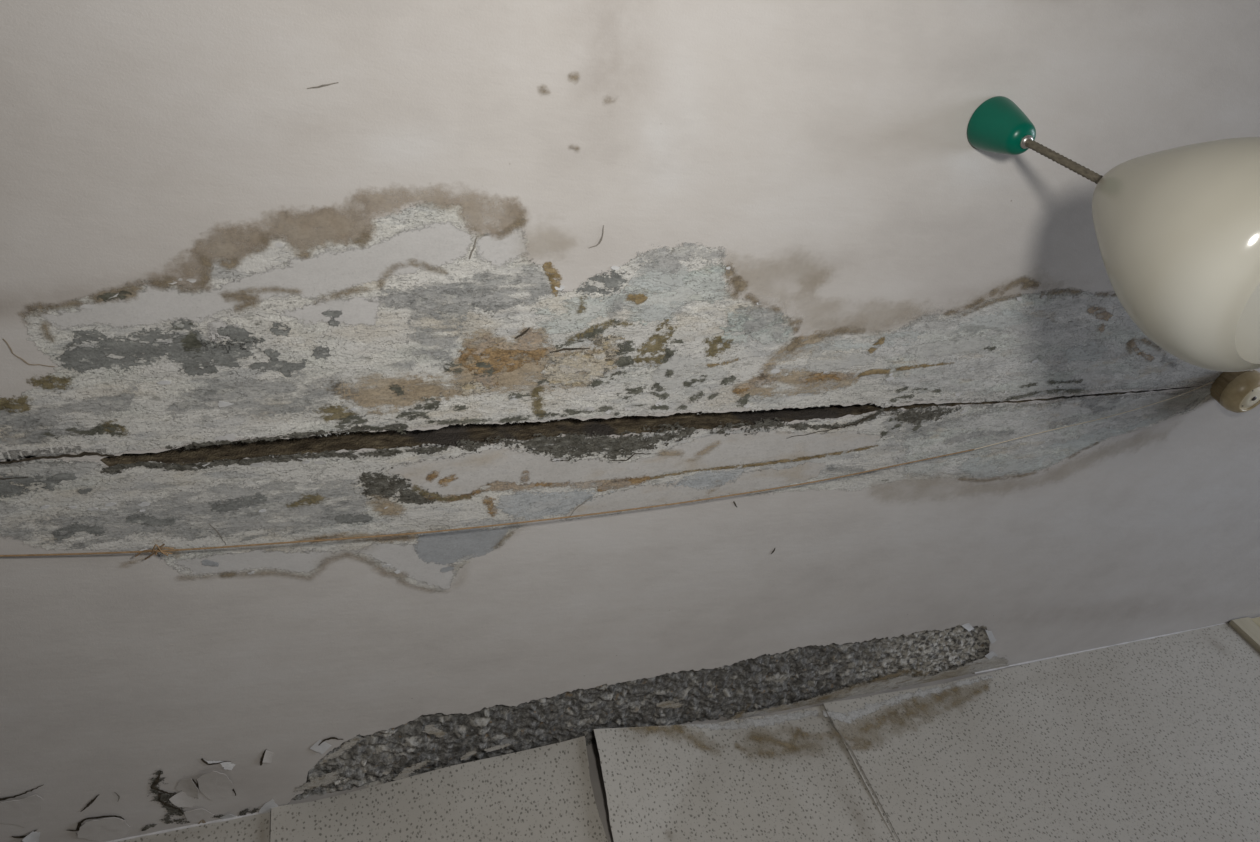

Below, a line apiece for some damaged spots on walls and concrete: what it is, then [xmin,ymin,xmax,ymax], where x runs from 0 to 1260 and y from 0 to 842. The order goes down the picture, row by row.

damp [22,189,525,340]
crack [0,384,1212,474]
peeling [0,201,1223,593]
spalling [287,623,1009,805]
spalling [67,758,259,841]